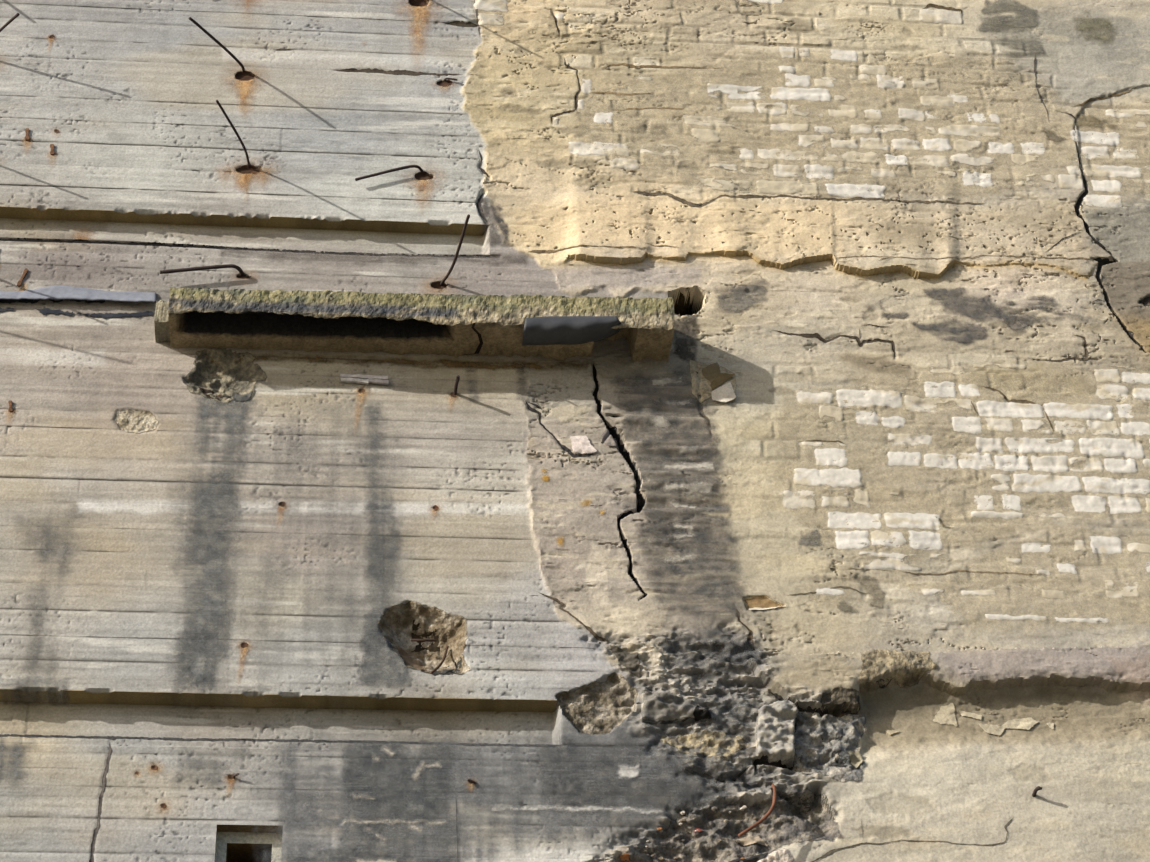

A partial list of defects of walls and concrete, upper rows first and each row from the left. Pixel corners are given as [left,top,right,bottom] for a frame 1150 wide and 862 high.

rust [409,0,429,42]
rust [236,164,262,186]
crack [836,53,1144,351]
spalling [182,347,267,403]
crack [774,324,895,357]
damp [325,407,407,685]
crack [524,364,647,599]
damp [616,315,743,615]
spalling [377,601,471,675]
damp [265,702,753,862]
spalling [556,645,749,761]
spalling [792,650,938,782]